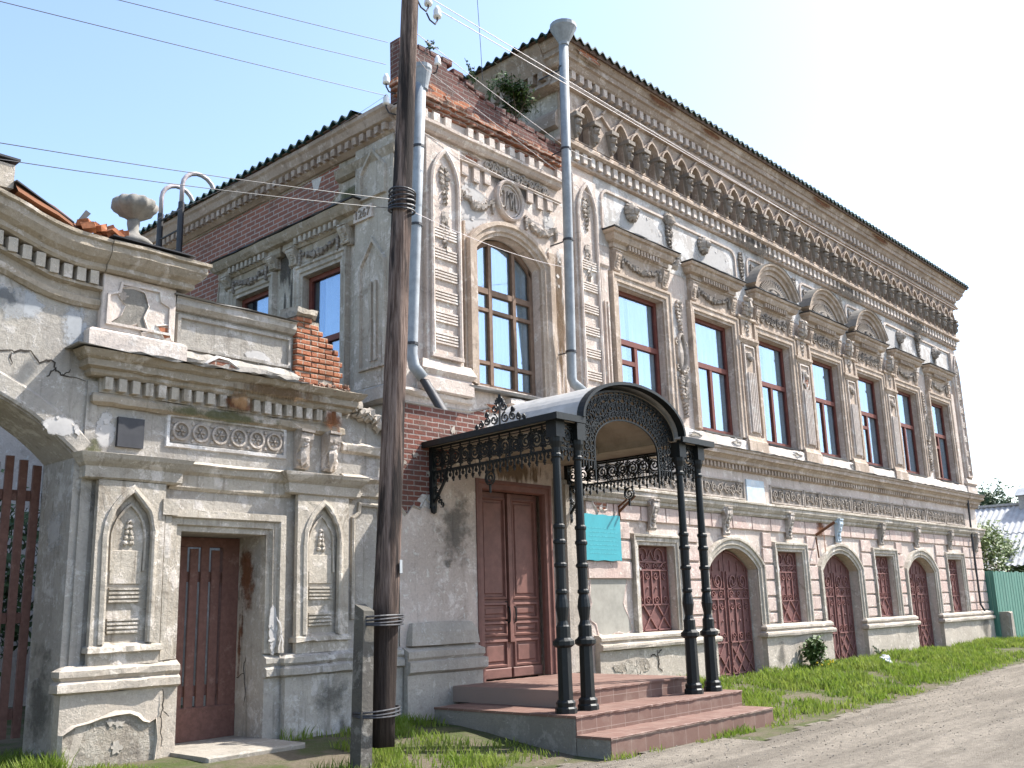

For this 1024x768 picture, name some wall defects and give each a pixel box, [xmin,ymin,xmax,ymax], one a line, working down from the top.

crack [0,349,85,381]
peeling [43,416,80,436]
leakage [445,505,466,547]
rust [237,552,255,672]